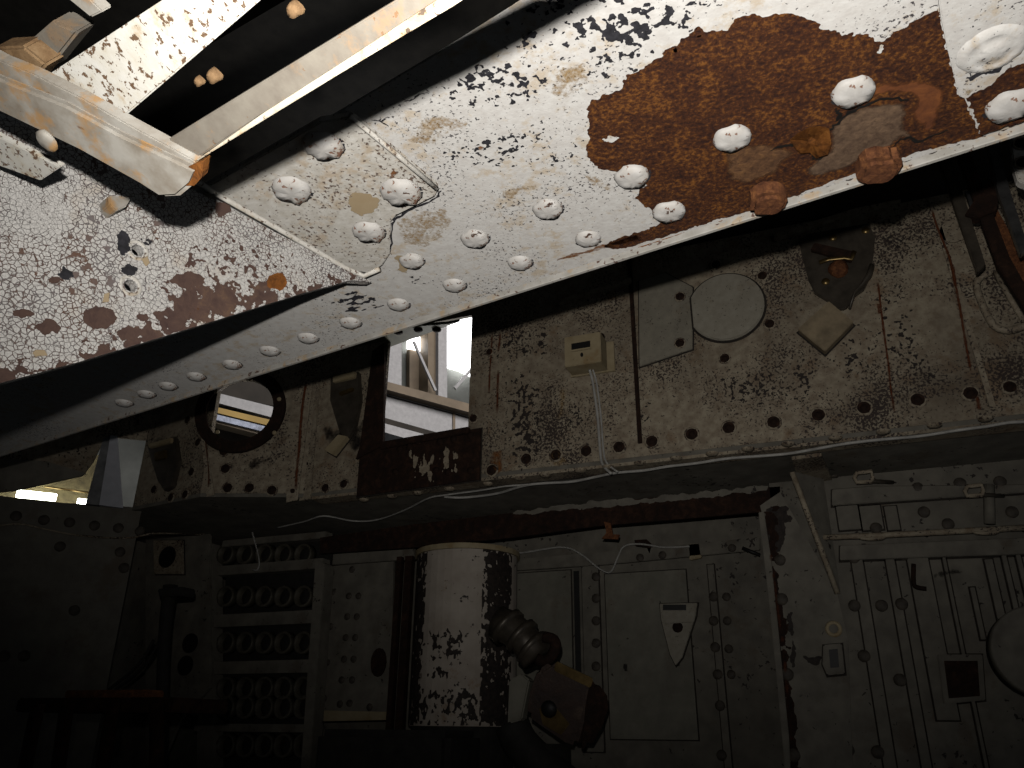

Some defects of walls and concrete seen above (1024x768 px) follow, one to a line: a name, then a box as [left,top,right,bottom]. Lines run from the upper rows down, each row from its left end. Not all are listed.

crack [390,191,441,255]
peeling [432,0,722,177]
rust [558,11,1024,260]
rust [0,271,355,383]
peeling [408,549,512,726]